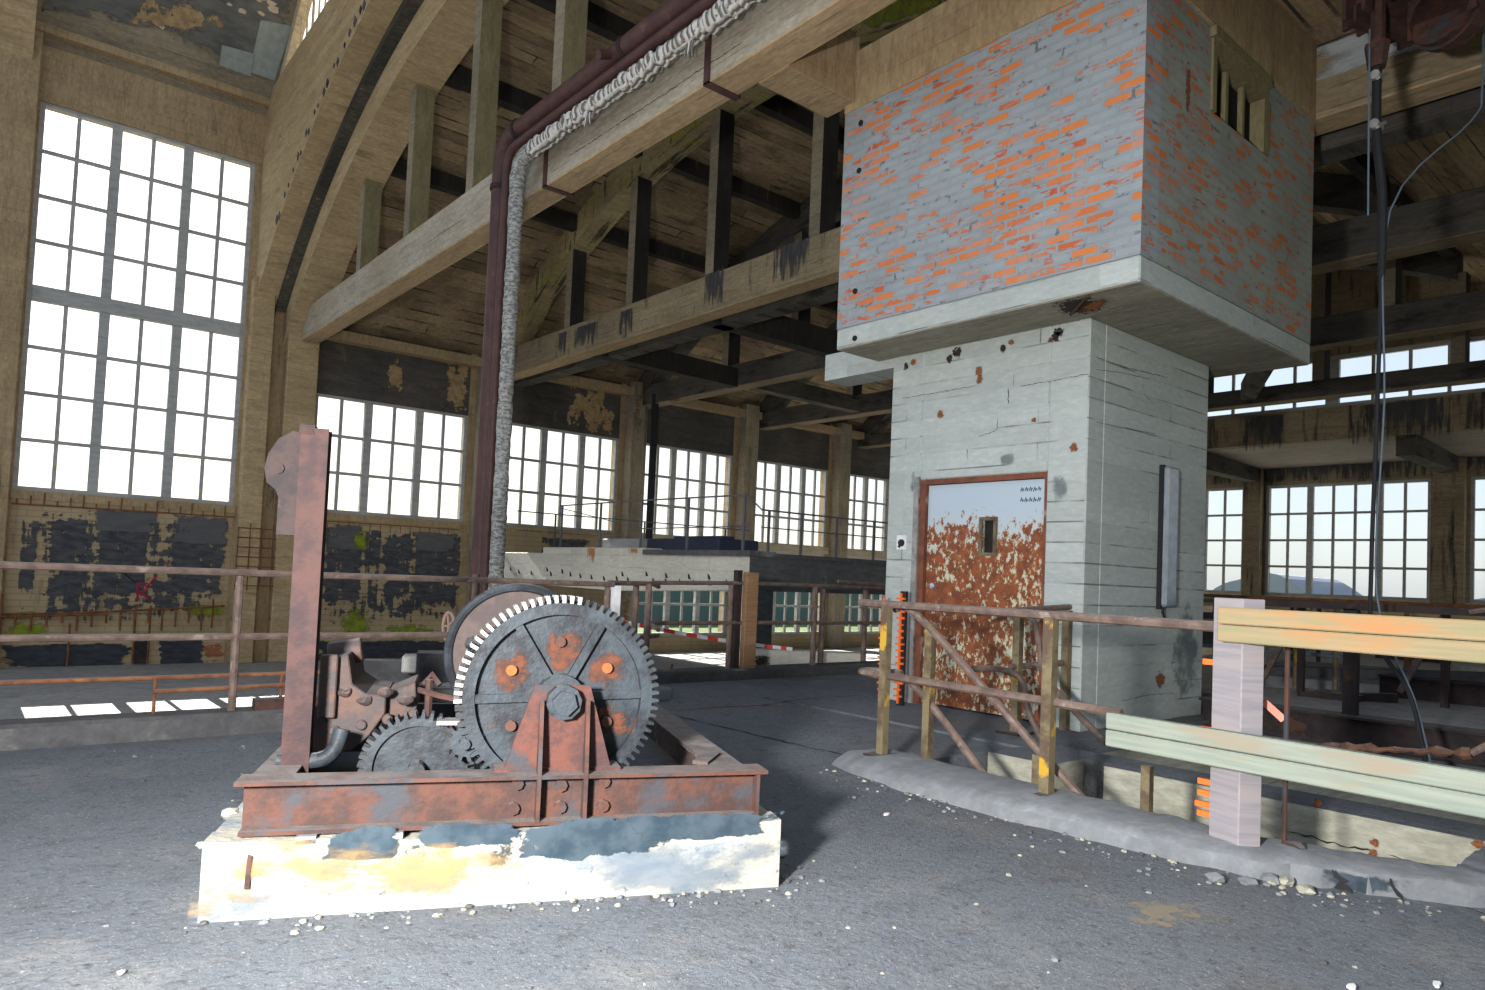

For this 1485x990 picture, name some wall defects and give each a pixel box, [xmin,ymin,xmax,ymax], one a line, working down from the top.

peeling [42,0,291,55]
damp [773,237,810,280]
damp [704,268,724,305]
damp [556,321,598,355]
damp [619,308,633,334]
damp [1240,415,1283,451]
damp [1349,397,1451,444]
damp [1262,461,1431,482]
peeling [0,493,277,667]
peeling [322,521,461,624]
peeling [318,641,328,660]
peeling [363,640,445,659]